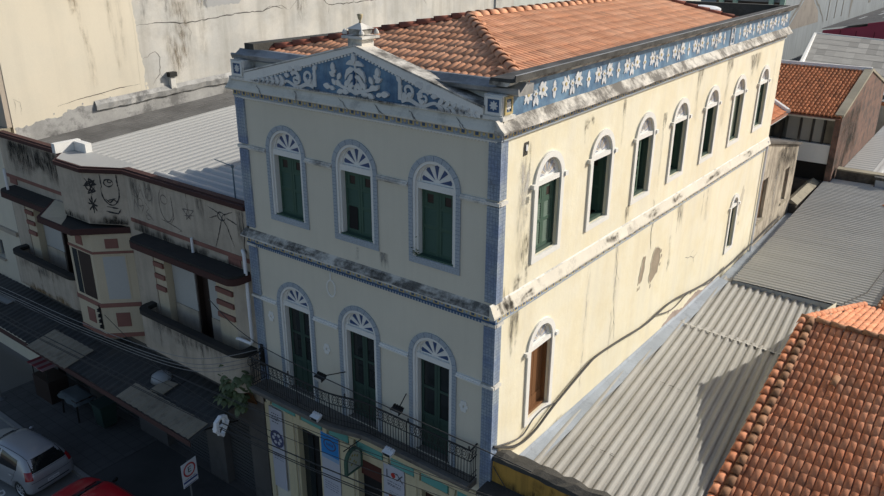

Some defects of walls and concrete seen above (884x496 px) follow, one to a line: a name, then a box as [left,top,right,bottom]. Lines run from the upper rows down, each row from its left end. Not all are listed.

crack [136,4,294,38]
crack [60,52,166,106]
peeling [637,246,662,291]